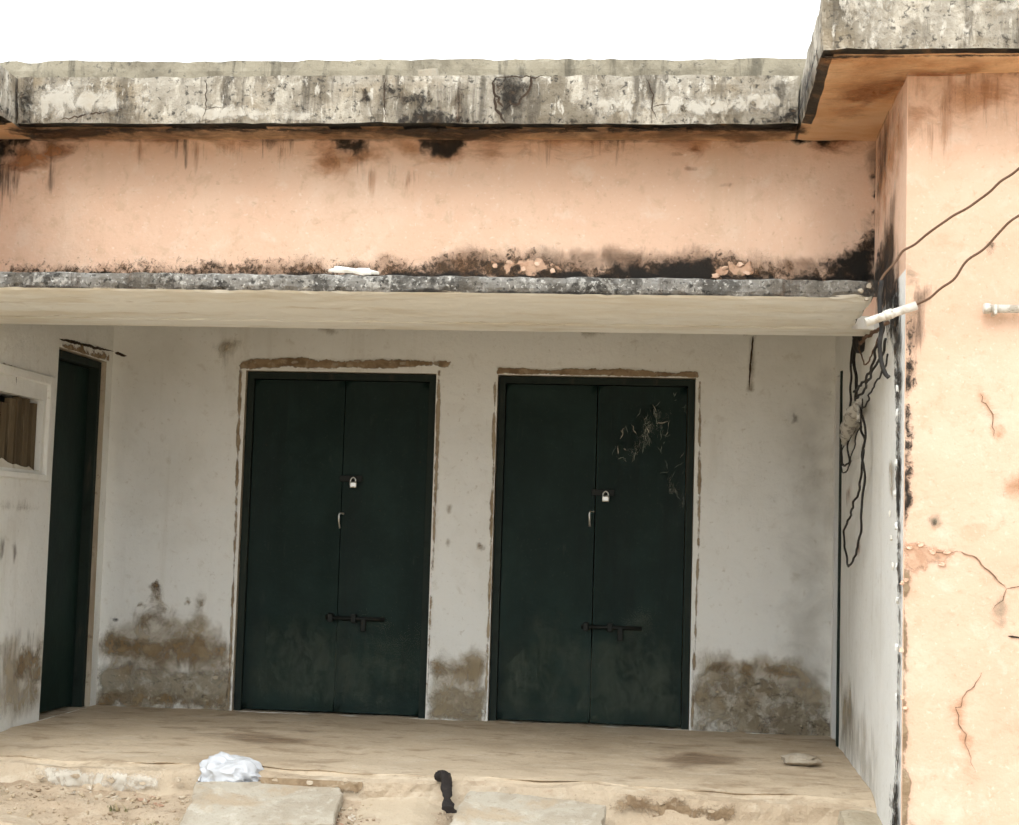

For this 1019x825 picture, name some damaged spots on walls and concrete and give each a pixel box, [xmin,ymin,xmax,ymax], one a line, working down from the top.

leakage [850,0,892,20]
leakage [0,40,1019,187]
leakage [9,223,900,358]
crack [936,551,1019,638]
leakage [4,647,41,711]
leakage [97,604,231,711]
leakage [428,654,485,721]
leakage [693,660,831,736]
crack [955,675,981,768]